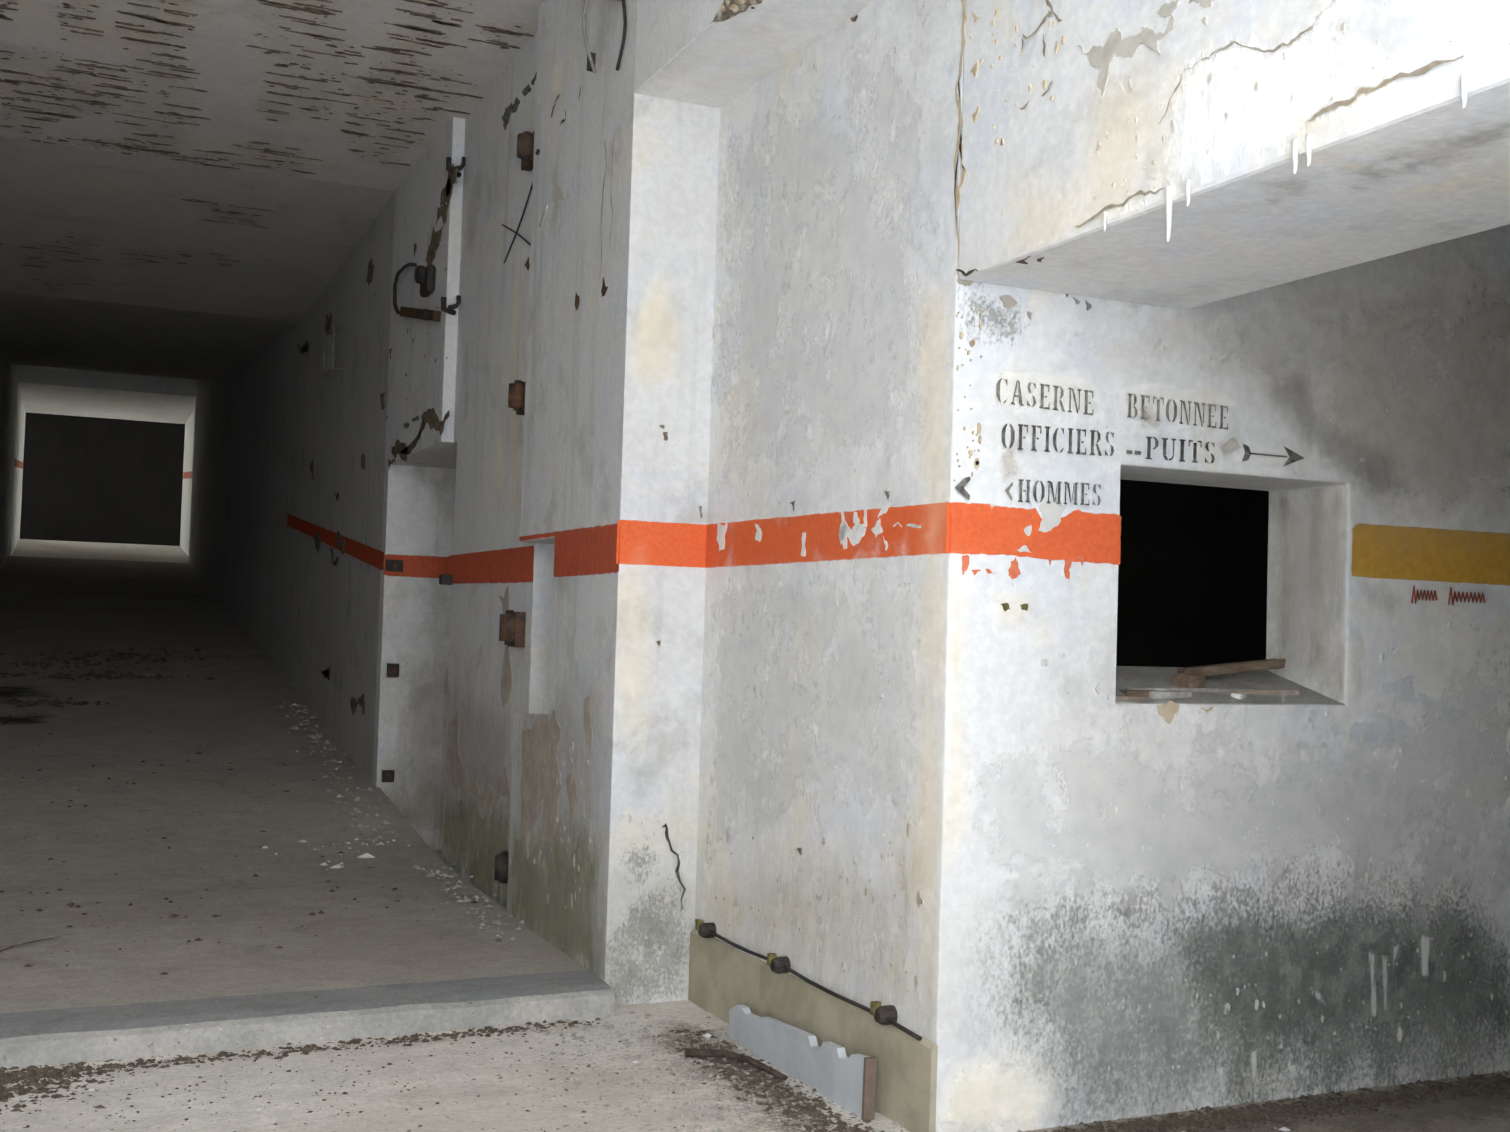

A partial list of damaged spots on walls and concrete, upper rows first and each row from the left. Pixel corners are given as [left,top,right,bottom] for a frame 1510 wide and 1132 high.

spalling [710,0,763,24]
peeling [1048,0,1214,103]
crack [1157,0,1335,125]
crack [1304,55,1464,124]
crack [953,0,978,276]
spalling [414,164,458,270]
crack [1075,188,1164,228]
spalling [388,408,450,468]
peeling [839,491,921,550]
peeling [962,497,1083,579]
crack [662,823,686,910]
damp [1019,846,1510,1112]